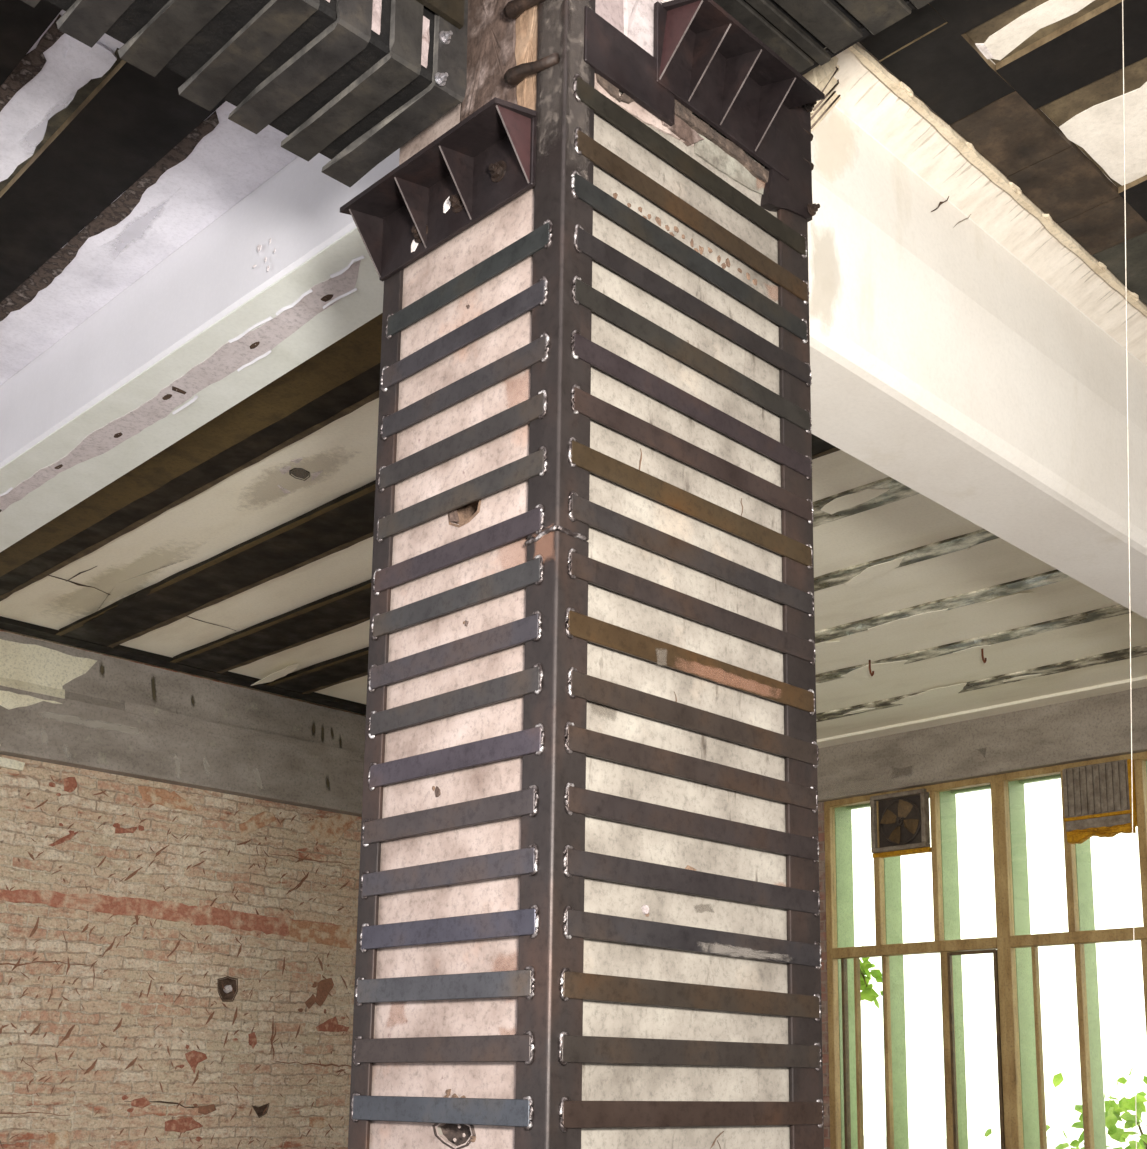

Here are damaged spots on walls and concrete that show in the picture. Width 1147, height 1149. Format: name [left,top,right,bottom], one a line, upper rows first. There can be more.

peeling [0,111,219,321]
peeling [0,255,365,512]
peeling [821,489,889,514]
peeling [0,639,97,710]
peeling [817,676,1147,749]
crack [272,854,346,865]
crack [0,961,95,986]
spalling [217,976,238,1002]
spalling [298,978,349,1032]
crack [271,1025,351,1067]
crack [0,1110,68,1118]
crack [124,1100,216,1108]